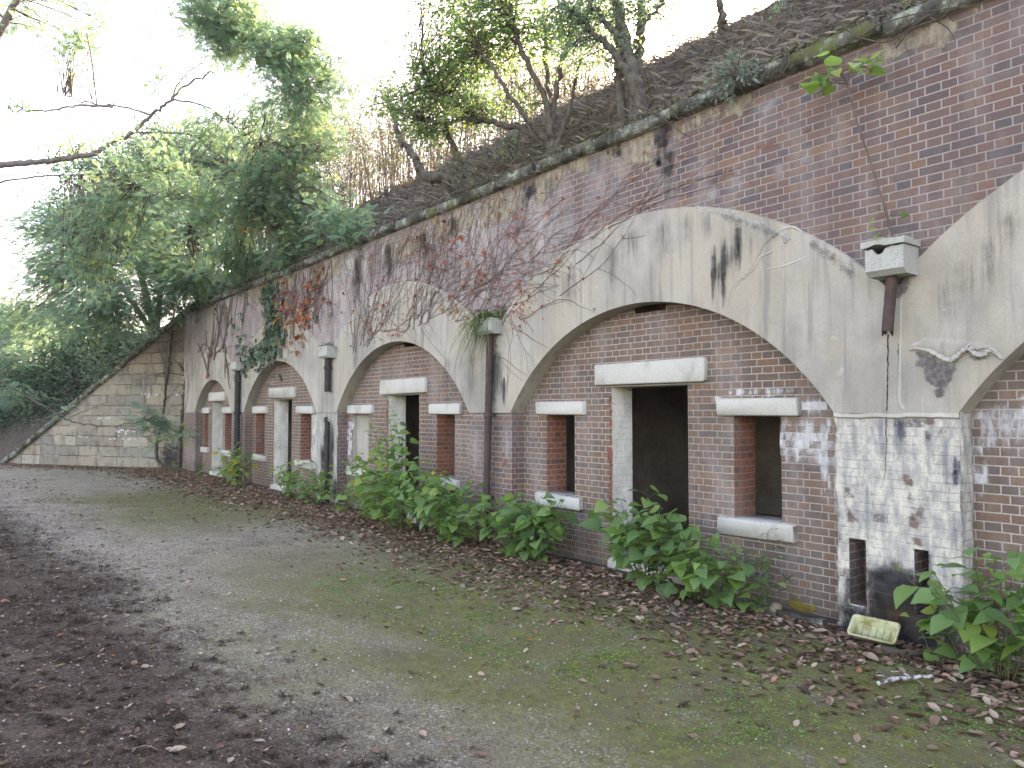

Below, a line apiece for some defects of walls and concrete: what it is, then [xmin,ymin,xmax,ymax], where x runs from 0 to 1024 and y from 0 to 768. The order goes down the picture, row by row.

leakage [654,125,673,176]
leakage [711,223,741,298]
leakage [715,388,783,400]
crack [884,295,905,477]
flaking render [916,352,955,397]
leakage [780,399,836,489]
leakage [895,422,905,443]
leakage [972,397,1024,484]
leakage [840,562,959,651]